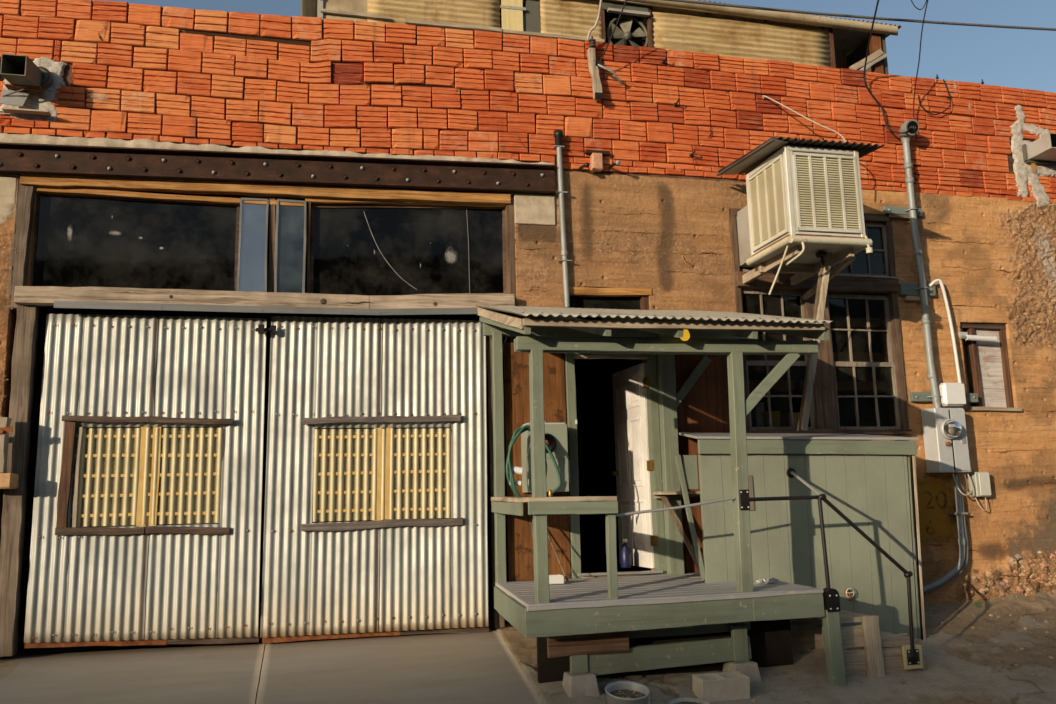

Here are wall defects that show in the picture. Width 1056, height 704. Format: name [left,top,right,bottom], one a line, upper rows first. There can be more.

peeling [939,551,1056,603]